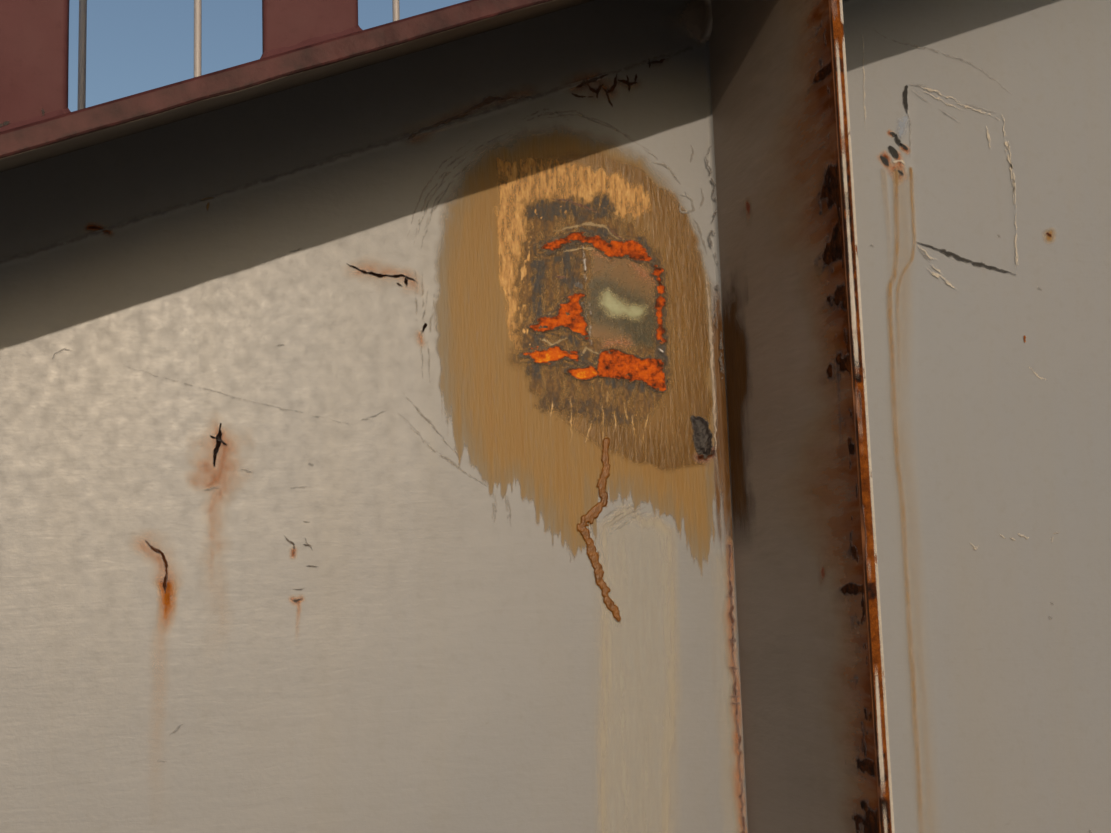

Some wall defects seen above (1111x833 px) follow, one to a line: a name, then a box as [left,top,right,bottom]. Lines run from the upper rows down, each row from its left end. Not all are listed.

crack [572,59,664,107]
crack [898,85,911,146]
crack [349,265,415,286]
crack [917,242,1016,288]
peeling [414,114,718,575]
leakage [706,279,751,577]
corrosion [787,0,895,833]
corrosion [879,131,922,814]
corrosion [159,580,175,623]